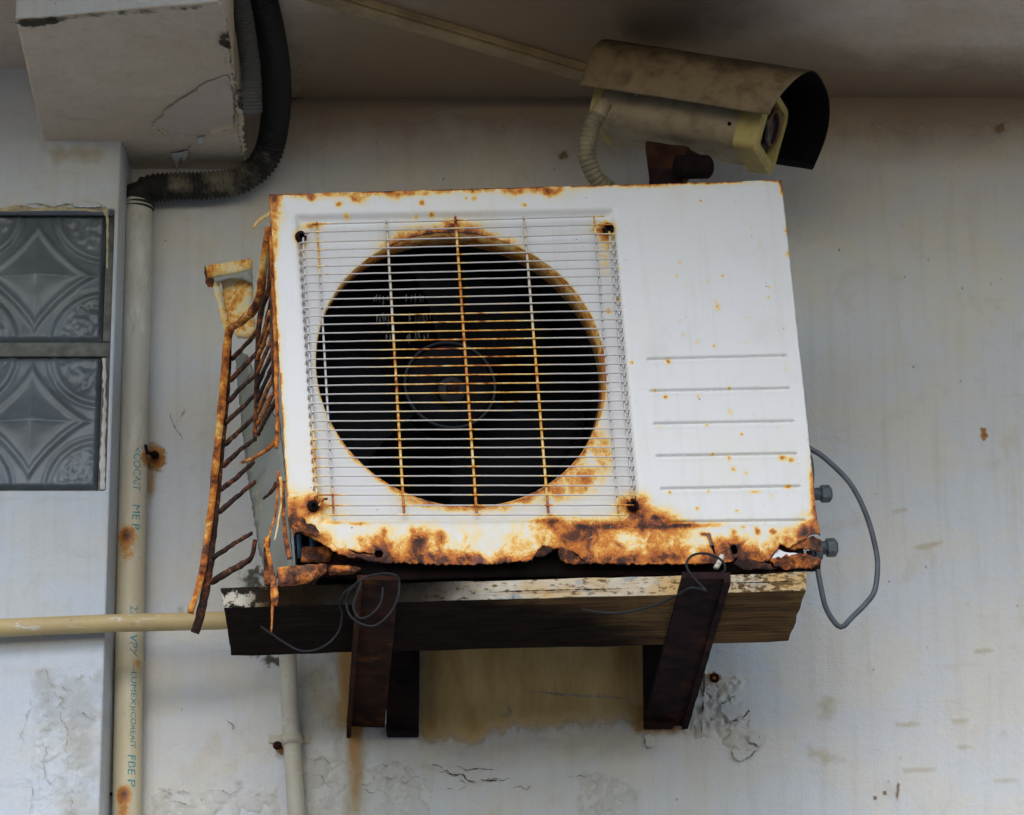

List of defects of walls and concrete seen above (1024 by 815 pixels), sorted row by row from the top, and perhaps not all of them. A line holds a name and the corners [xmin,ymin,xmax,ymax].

peeling [152,0,247,171]
water stain [419,645,643,743]
spalling [680,662,772,762]
crack [433,764,532,790]